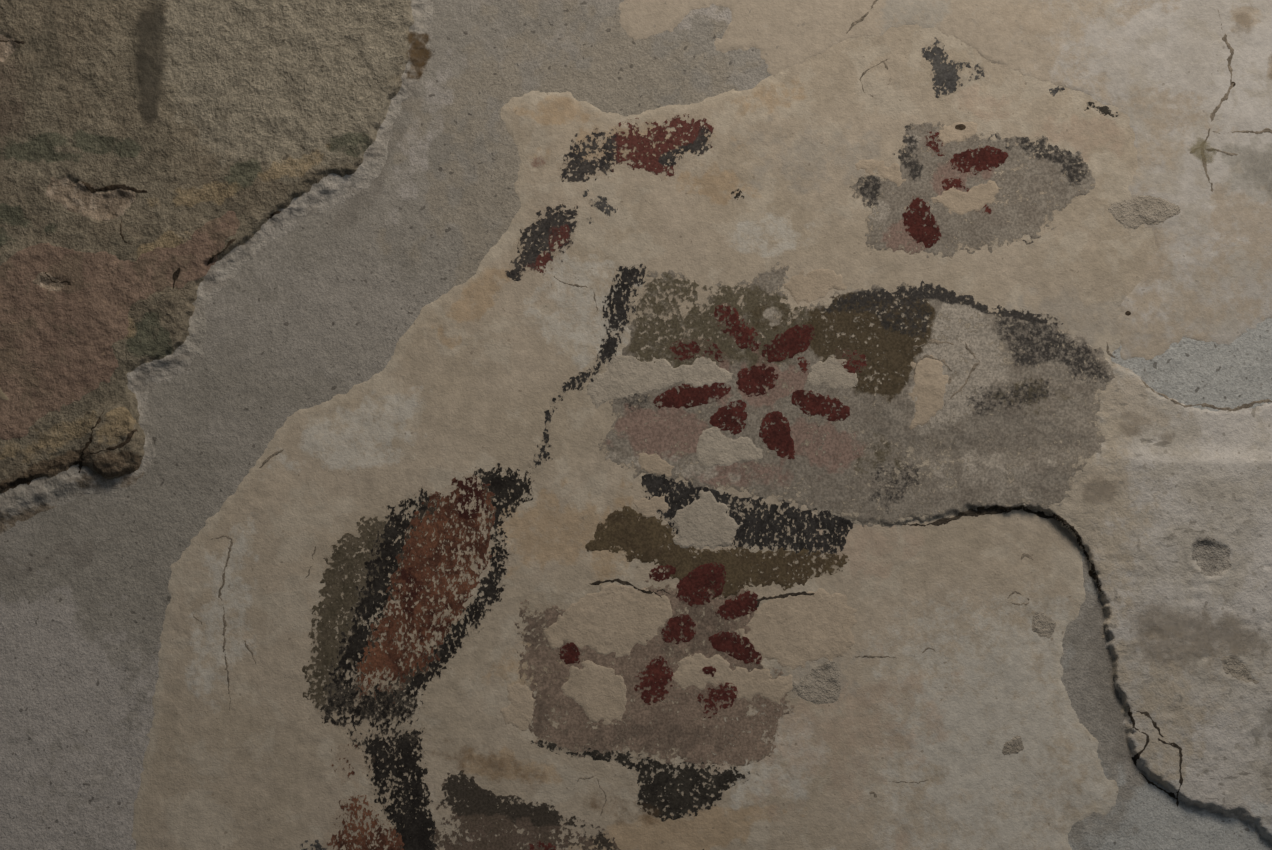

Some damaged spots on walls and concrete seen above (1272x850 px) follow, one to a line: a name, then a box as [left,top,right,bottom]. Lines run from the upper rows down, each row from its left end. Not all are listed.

crack [1190,10,1272,192]
spalling [45,177,136,221]
crack [903,505,1103,594]
spalling [1191,536,1232,576]
crack [1007,591,1030,605]
spalling [1031,612,1056,639]
spalling [1220,656,1259,684]
peeling [500,683,536,731]
spalling [1002,736,1024,755]
crack [1128,706,1183,807]